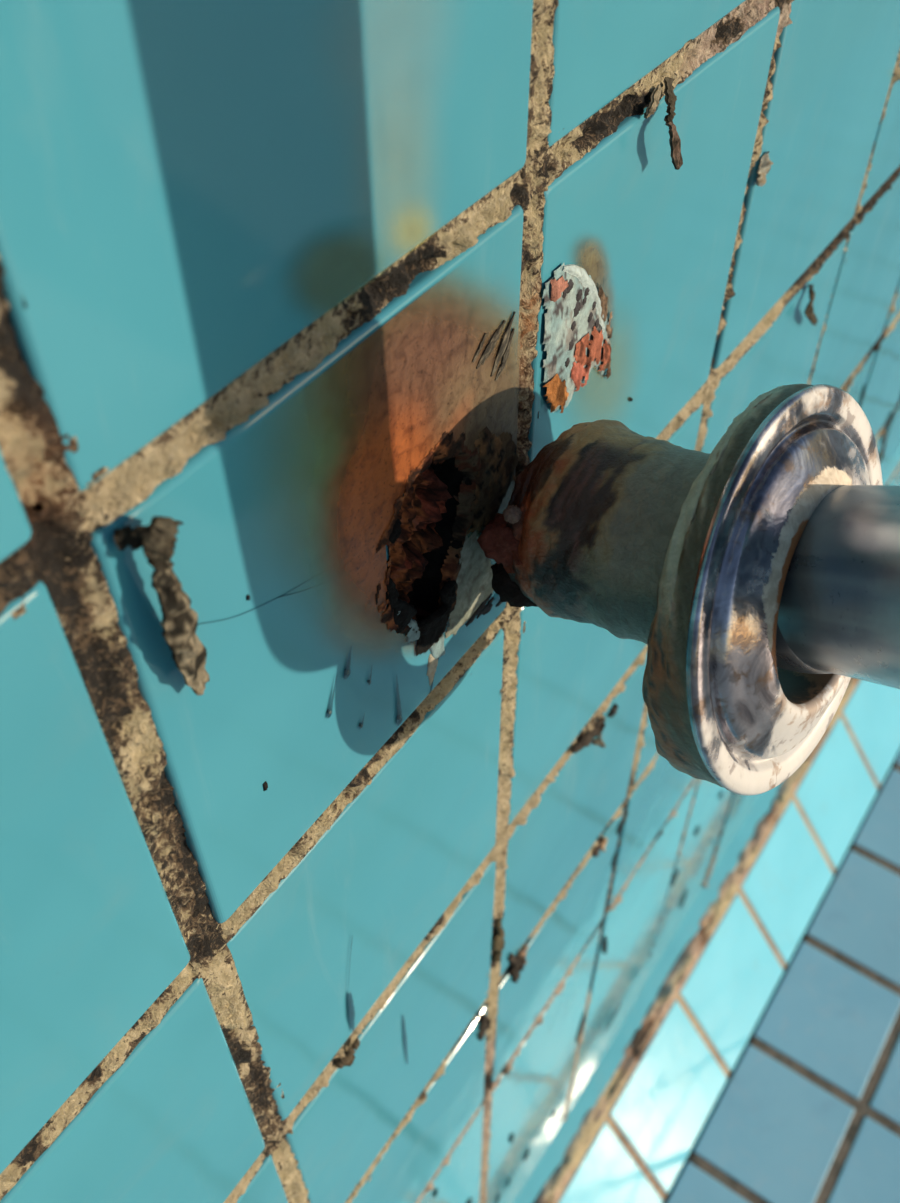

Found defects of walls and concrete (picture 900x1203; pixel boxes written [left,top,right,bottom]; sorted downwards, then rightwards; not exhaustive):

spalling [542,263,613,413]
peeling [113,516,210,696]
rust [309,288,521,643]
spalling [387,453,502,659]